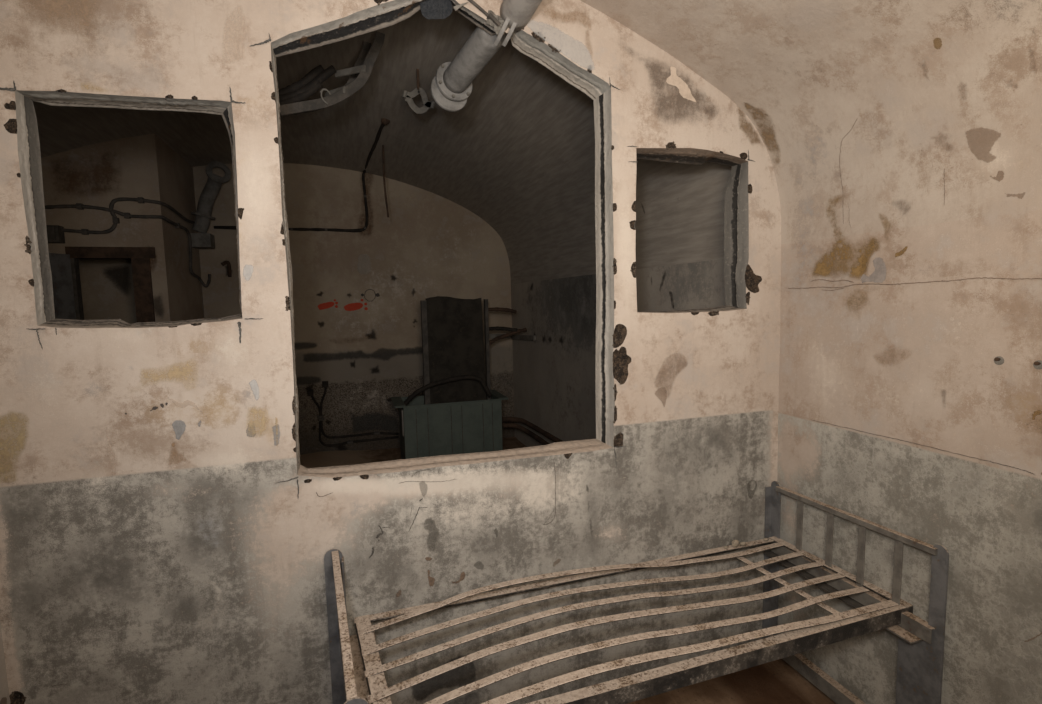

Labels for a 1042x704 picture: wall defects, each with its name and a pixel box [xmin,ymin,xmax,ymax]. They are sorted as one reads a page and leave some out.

peeling [666,66,696,102]
crack [789,277,1042,291]
spalling [612,324,631,448]